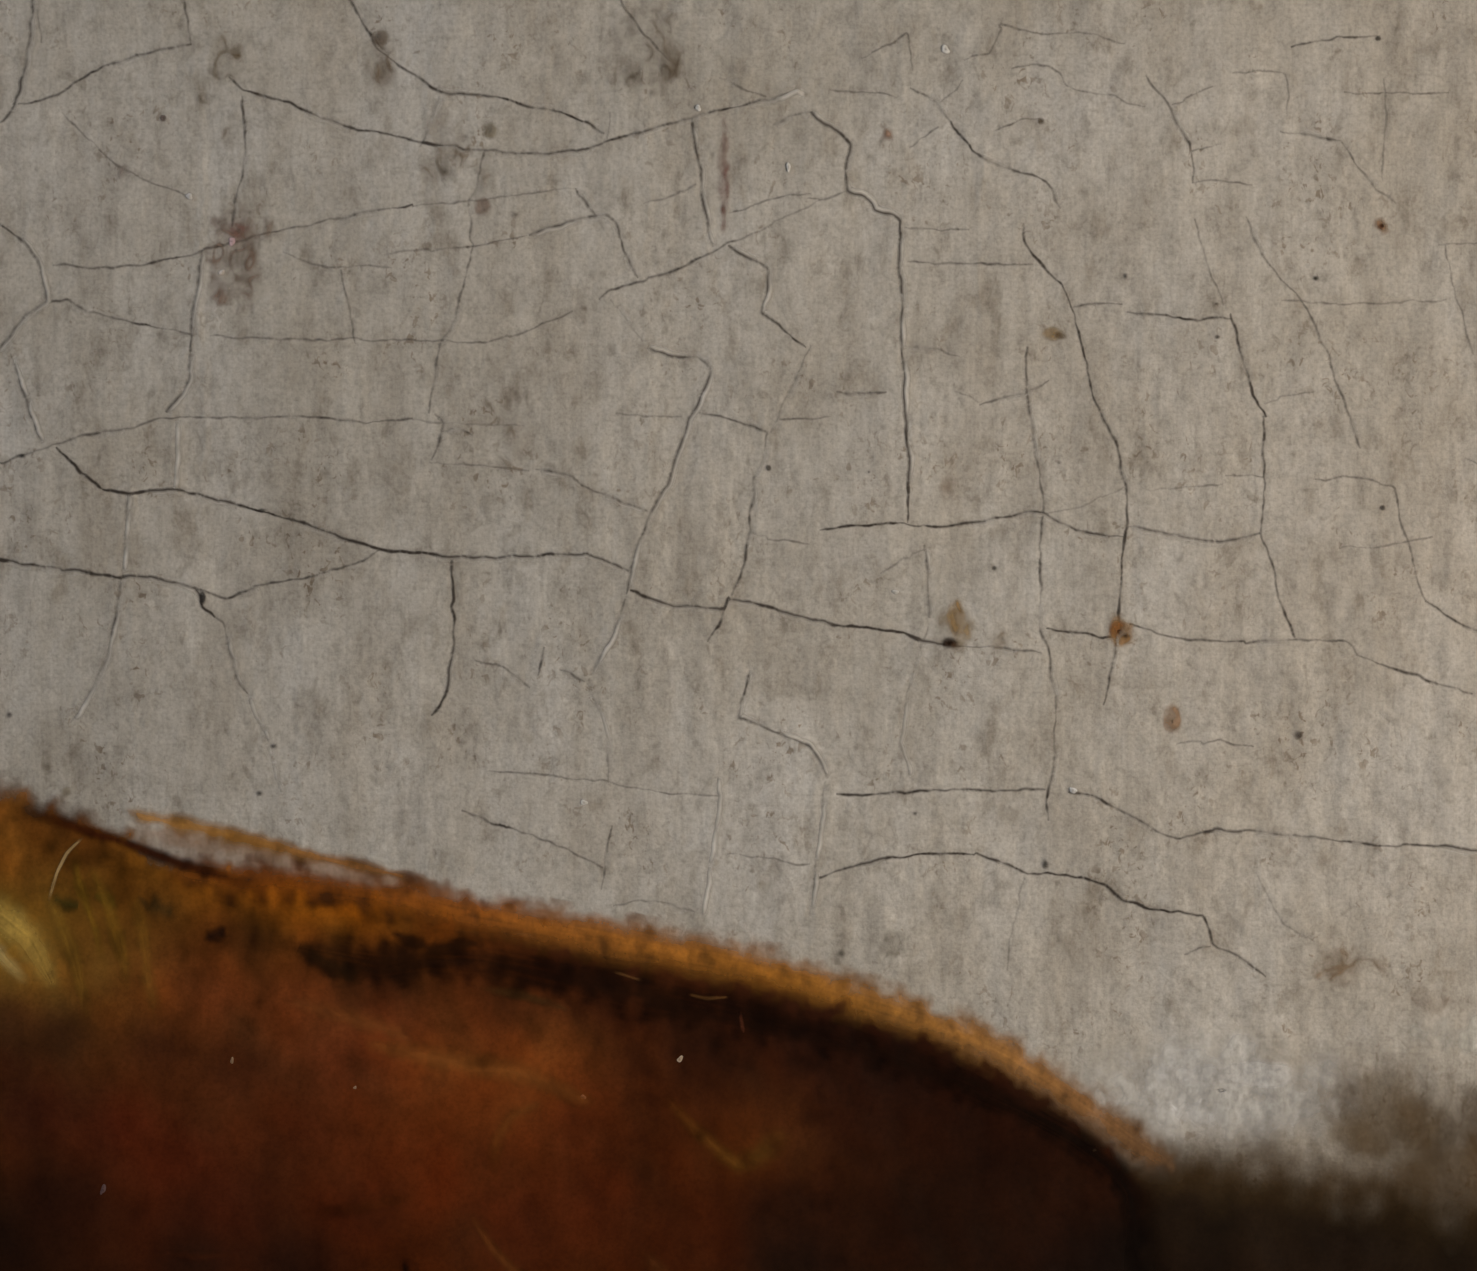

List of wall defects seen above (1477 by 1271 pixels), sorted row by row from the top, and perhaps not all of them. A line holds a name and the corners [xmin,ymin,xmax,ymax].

crack [0,0,1344,773]
crack [738,674,1477,975]
crack [1381,664,1473,694]